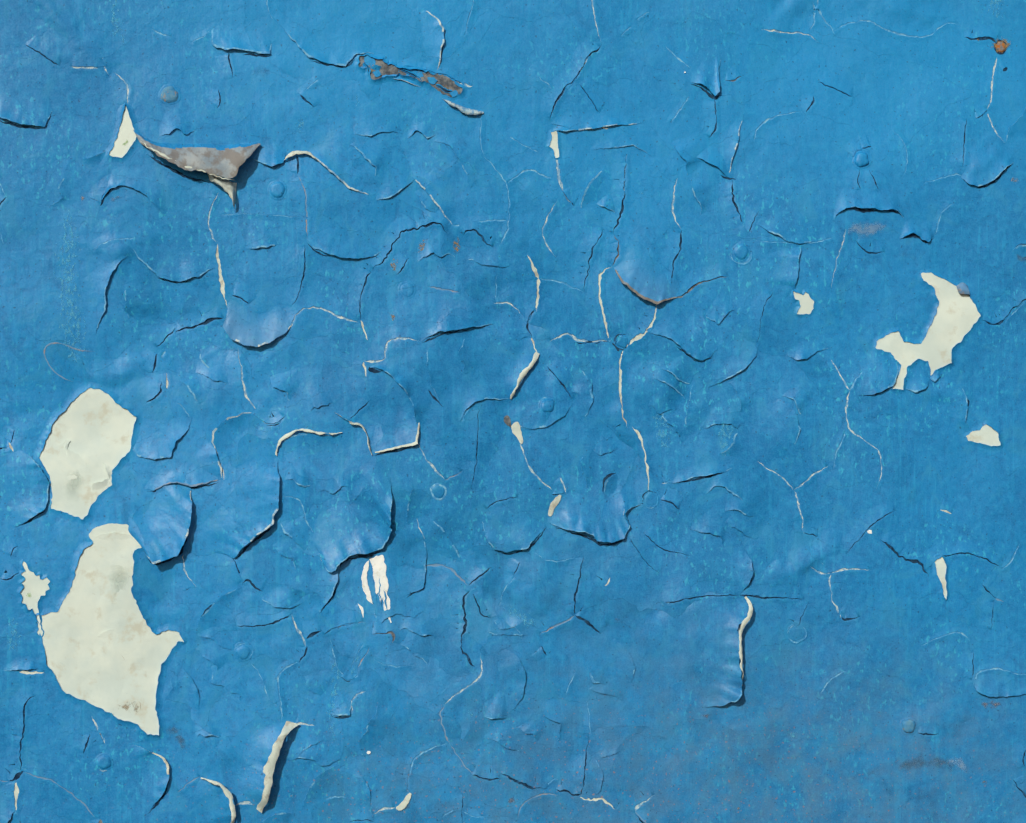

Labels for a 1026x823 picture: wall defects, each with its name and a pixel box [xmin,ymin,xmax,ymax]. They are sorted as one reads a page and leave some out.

crack [750,0,1010,148]
peeling [80,103,457,261]
crack [138,189,231,406]
peeling [223,282,293,347]
crack [284,111,730,516]
peeling [789,288,817,318]
peeling [856,269,984,396]
peeling [963,420,1005,451]
peeling [0,294,495,823]
crack [659,357,1023,680]
crack [324,518,621,823]
crack [0,686,108,823]